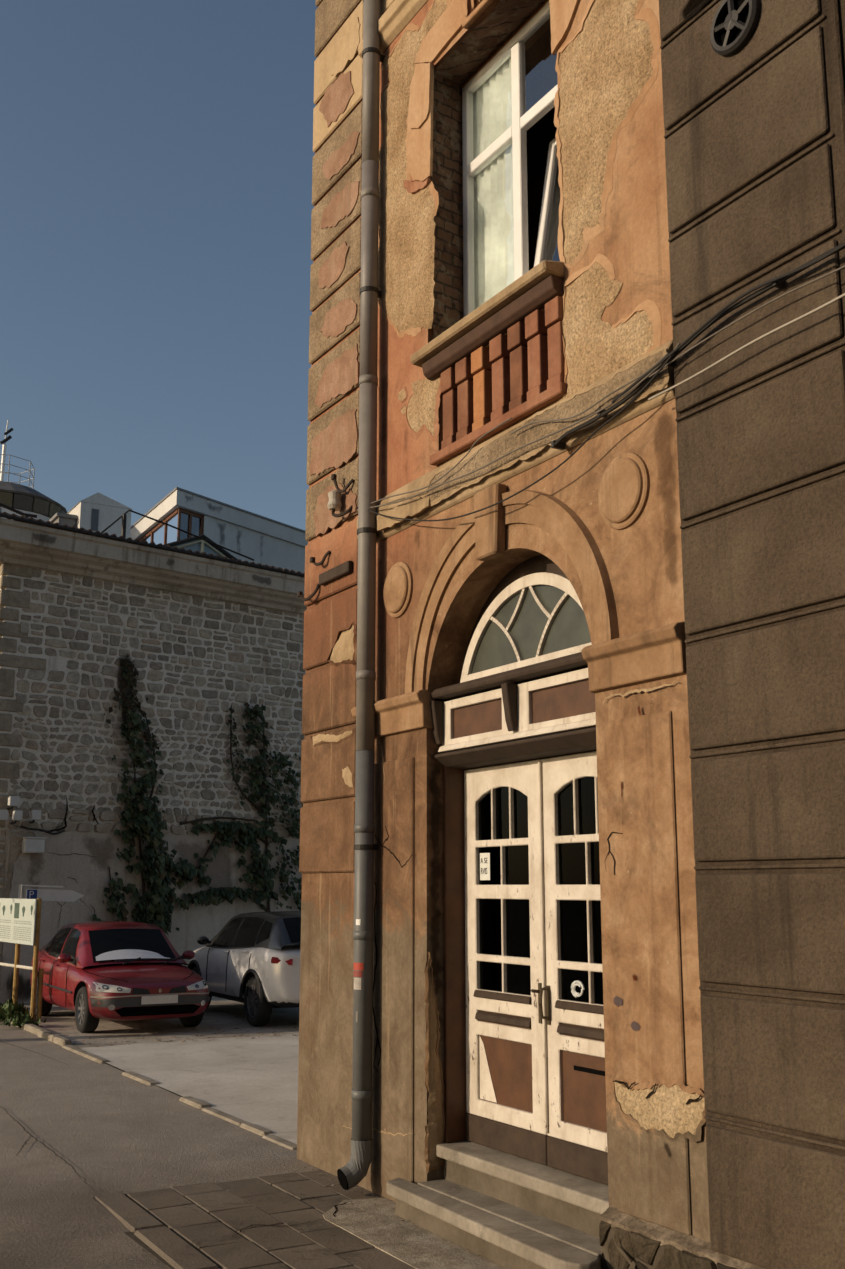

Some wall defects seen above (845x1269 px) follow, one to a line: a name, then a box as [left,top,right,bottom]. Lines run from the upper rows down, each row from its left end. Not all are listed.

peeling [319,17,361,127]
flaking render [377,0,669,531]
peeling [320,298,357,338]
peeling [314,344,359,408]
peeling [309,409,358,537]
crack [0,1106,93,1190]
flaking render [613,1075,706,1142]